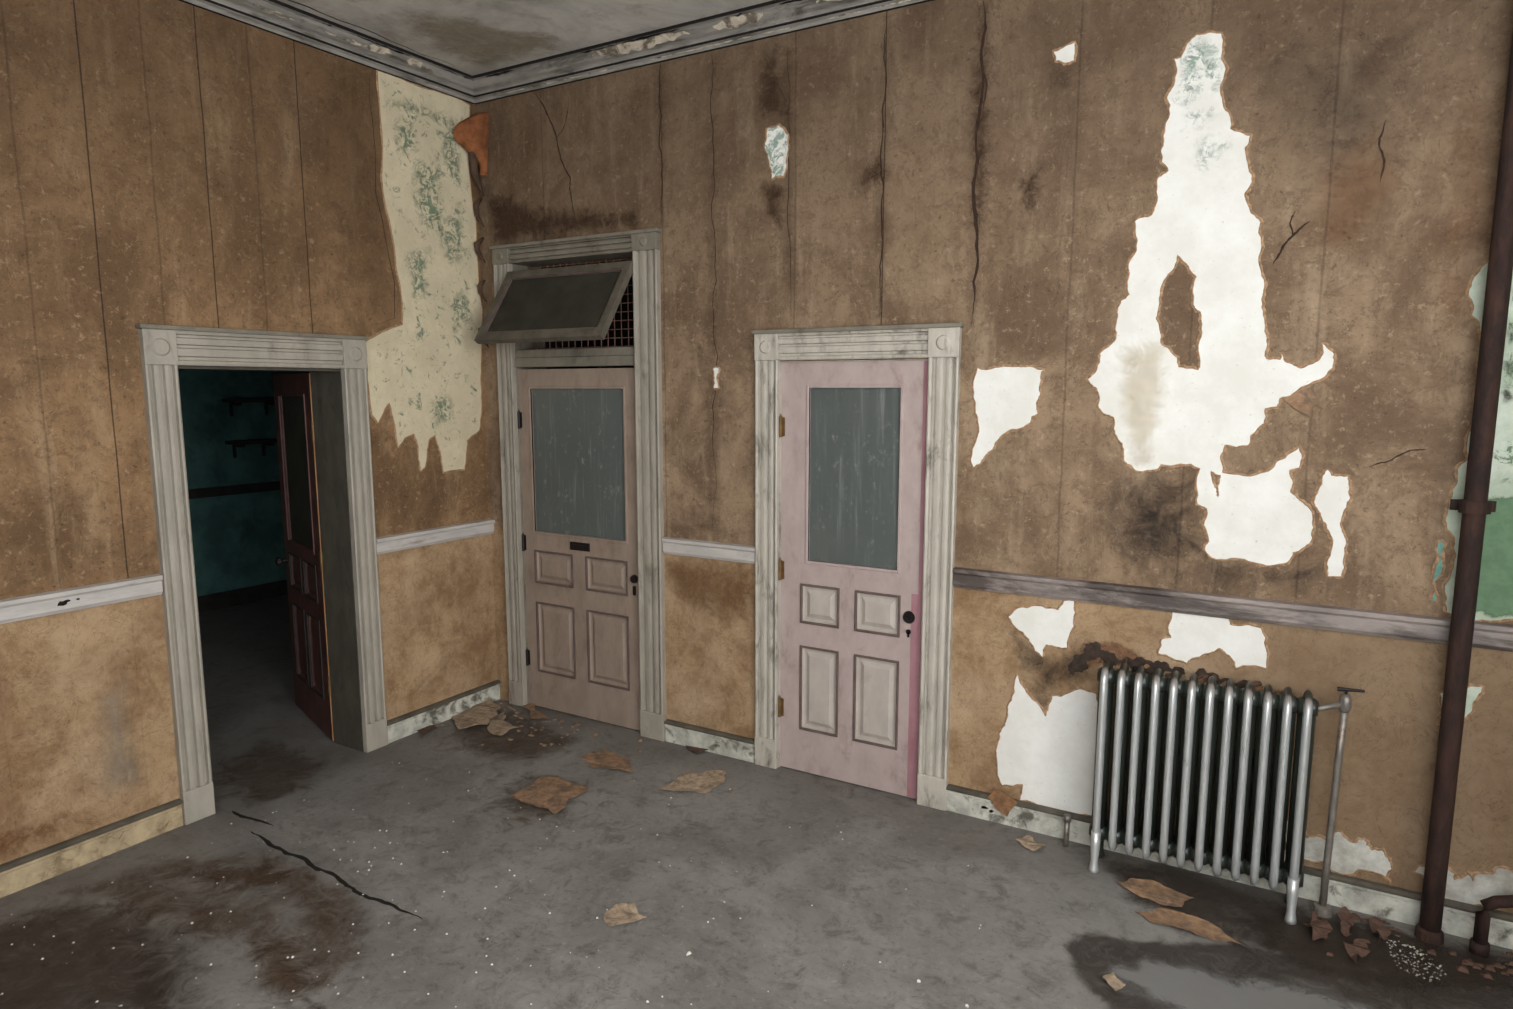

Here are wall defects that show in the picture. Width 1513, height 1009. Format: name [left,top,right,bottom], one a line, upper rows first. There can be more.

peeling [779,0,910,19]
peeling [506,12,800,93]
spalling [1067,641,1284,694]
damp [0,860,353,1009]
damp [1067,861,1513,1009]